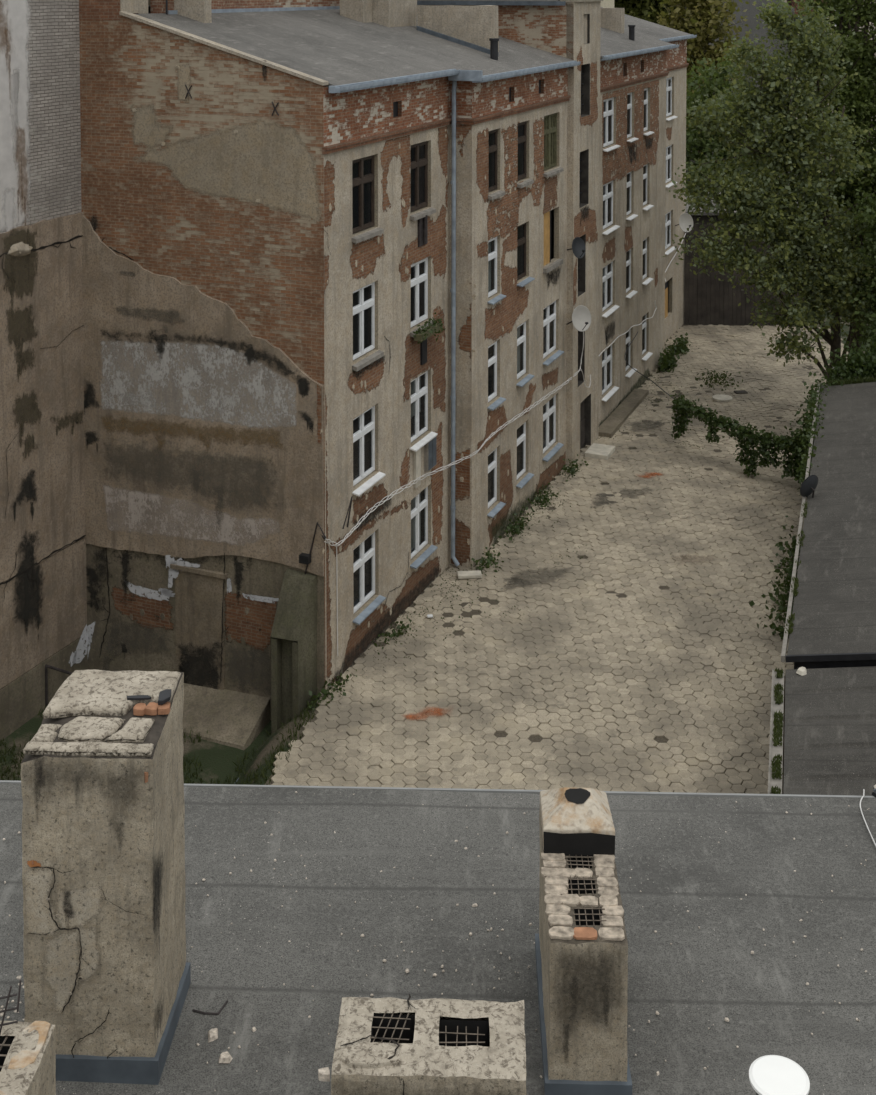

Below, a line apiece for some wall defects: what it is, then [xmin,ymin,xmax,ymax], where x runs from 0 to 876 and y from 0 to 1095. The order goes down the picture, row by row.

crack [0,228,133,279]
damp [0,0,310,523]
flaking render [350,233,385,279]
flaking render [399,118,558,343]
flaking render [317,283,507,682]
flaking render [488,449,513,546]
damp [14,534,44,639]
crack [0,535,86,599]
peeling [127,555,200,601]
crack [29,866,90,1012]
damp [153,859,163,948]
crack [71,1008,110,1058]